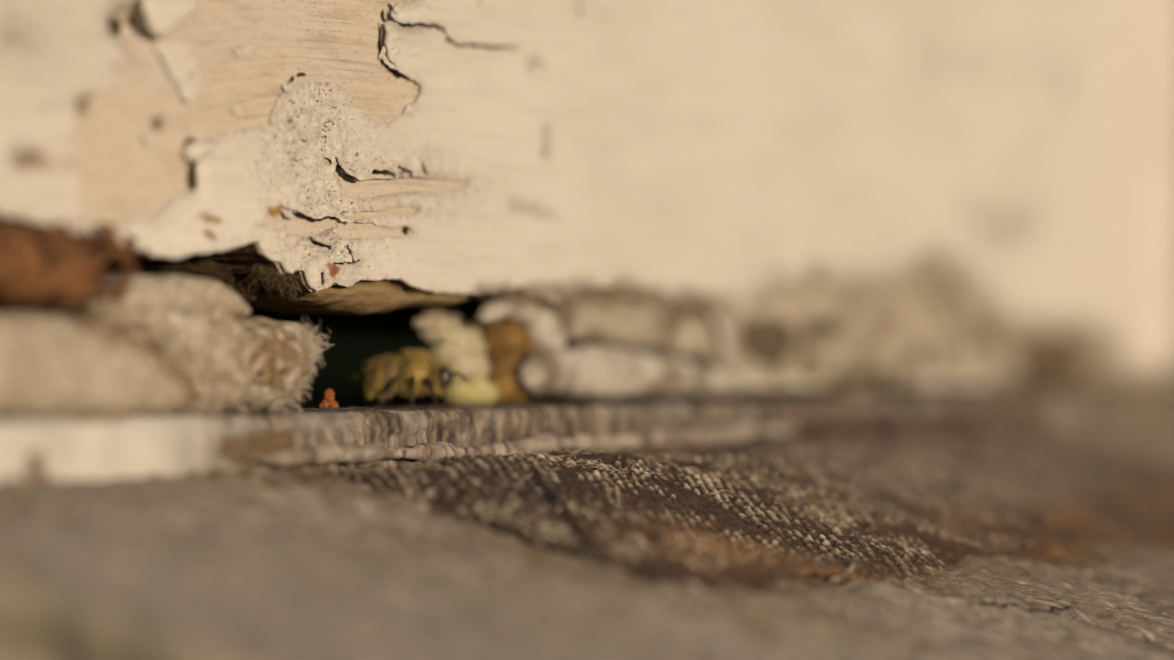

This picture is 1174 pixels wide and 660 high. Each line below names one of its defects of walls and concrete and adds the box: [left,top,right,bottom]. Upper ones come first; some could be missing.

peeling [8,0,421,228]
peeling [262,157,467,248]